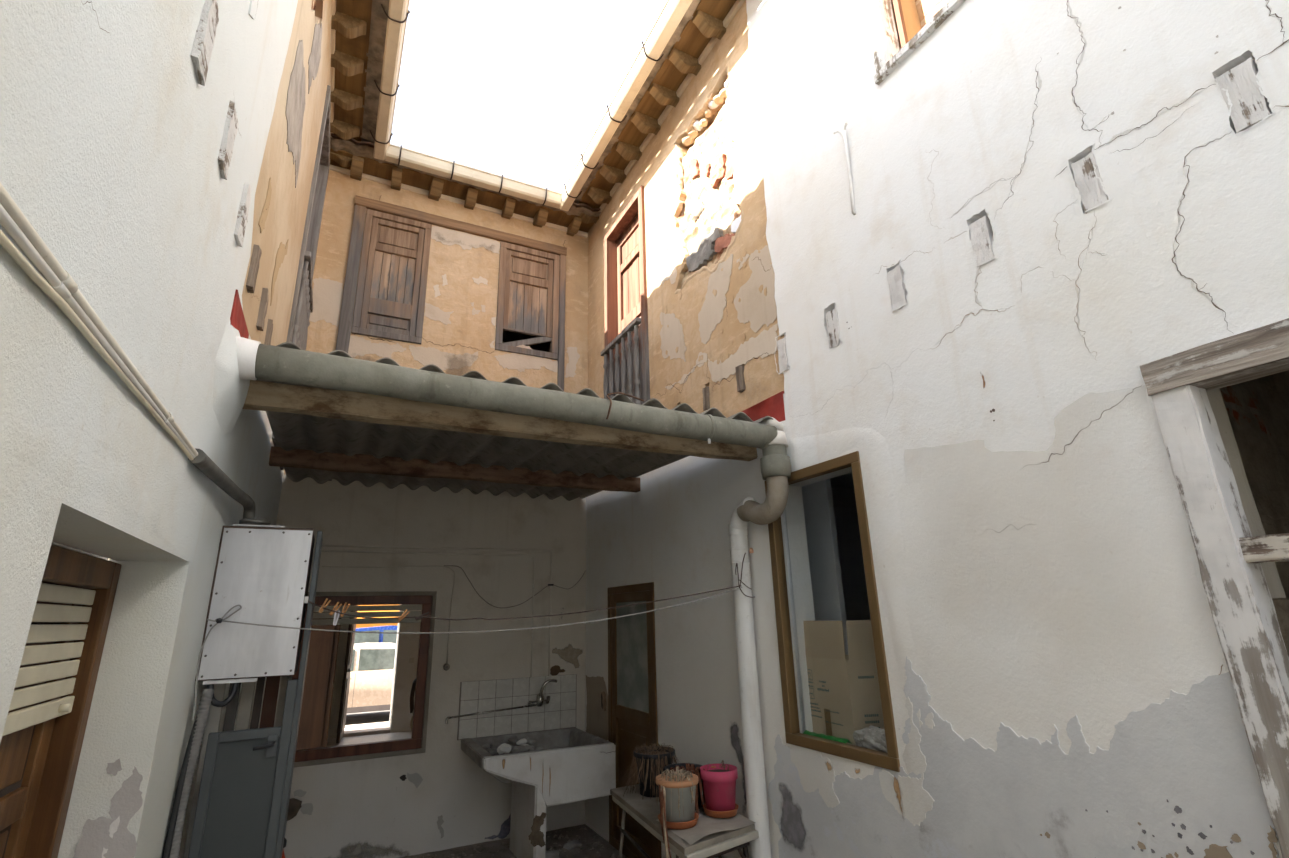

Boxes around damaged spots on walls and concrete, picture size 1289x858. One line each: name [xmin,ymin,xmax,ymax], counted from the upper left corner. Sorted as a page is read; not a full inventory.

spalling [647,63,789,390]
crack [877,55,1042,274]
crack [819,201,1104,421]
crack [1066,1,1213,152]
crack [1172,131,1232,320]
crack [1258,0,1288,59]
crack [1023,386,1141,468]
peeling [73,758,143,858]
peeling [550,644,608,740]
peeling [768,656,1279,858]